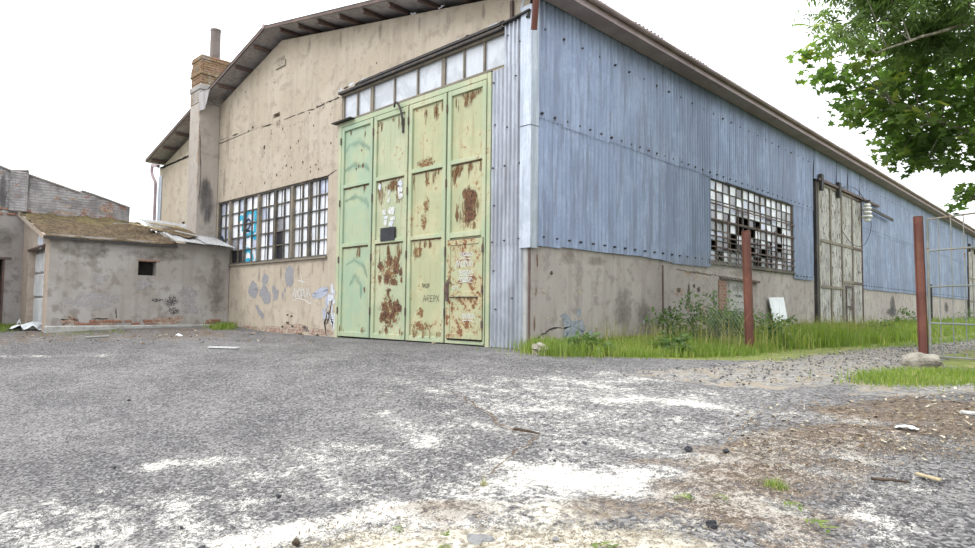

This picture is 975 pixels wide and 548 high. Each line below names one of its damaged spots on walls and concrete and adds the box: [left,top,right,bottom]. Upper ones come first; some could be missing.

corrosion [455,89,481,110]
water stain [201,180,211,220]
corrosion [344,157,482,229]
corrosion [343,198,441,338]